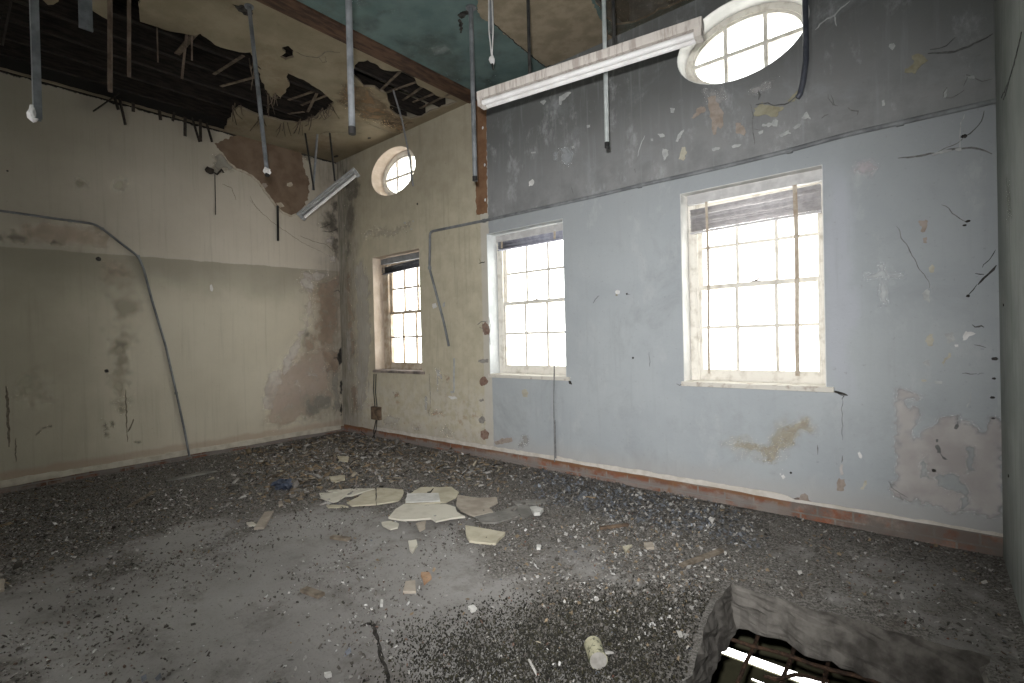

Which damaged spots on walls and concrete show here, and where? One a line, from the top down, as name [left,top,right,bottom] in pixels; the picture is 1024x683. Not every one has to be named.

spalling [215,135,310,217]
peeling [651,130,687,161]
peeling [691,91,811,151]
crack [900,32,1022,158]
damp [326,173,358,262]
crack [896,226,930,288]
crack [968,251,997,295]
damp [264,263,370,424]
peeling [890,389,1009,518]
crack [360,620,391,683]